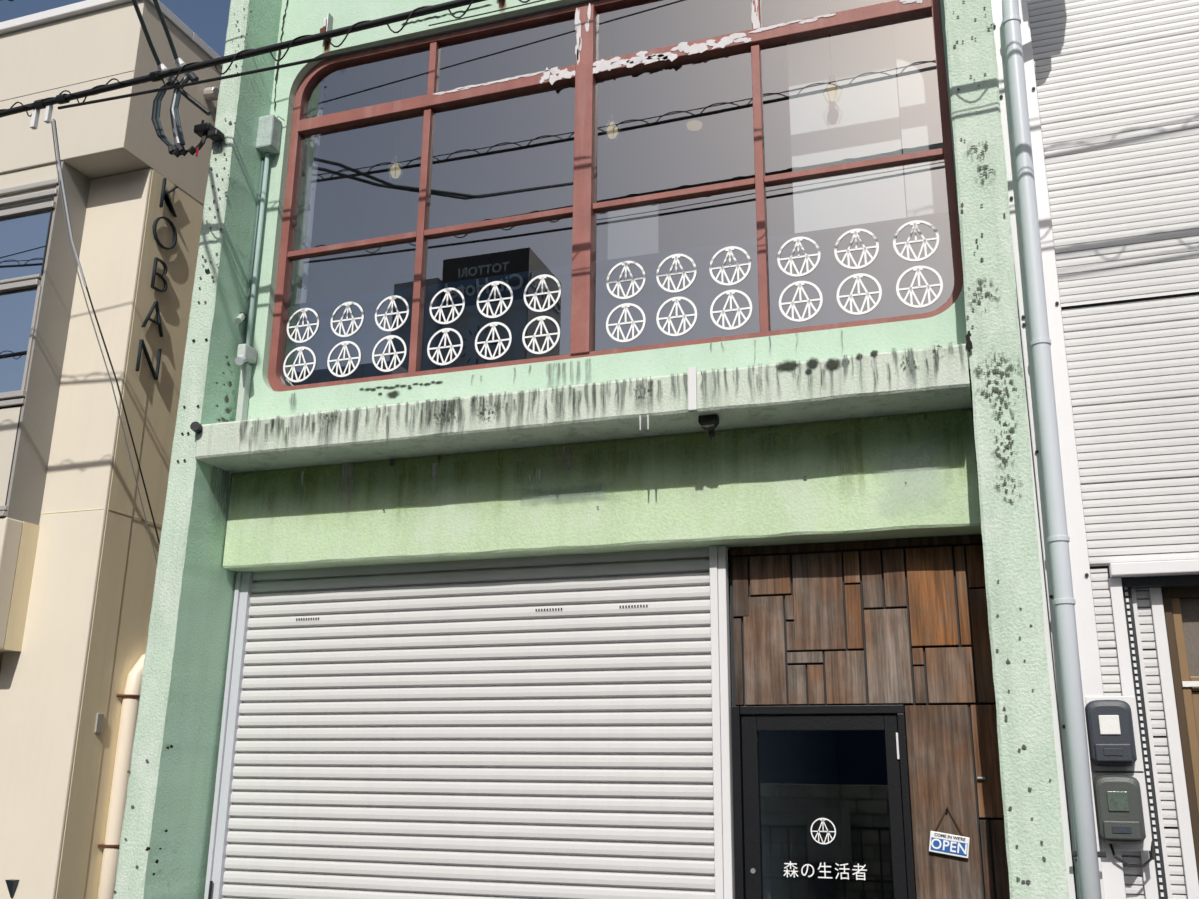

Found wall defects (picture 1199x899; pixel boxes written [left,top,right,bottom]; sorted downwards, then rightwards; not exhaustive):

leakage [967,141,995,183]
leakage [968,278,997,313]
leakage [240,342,1024,504]